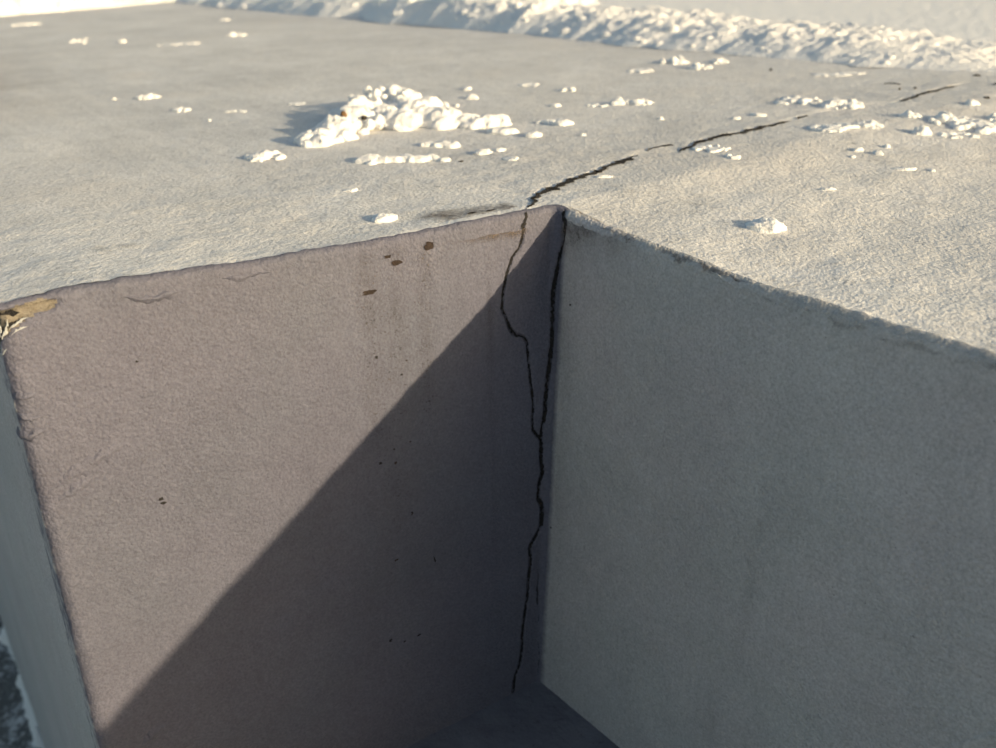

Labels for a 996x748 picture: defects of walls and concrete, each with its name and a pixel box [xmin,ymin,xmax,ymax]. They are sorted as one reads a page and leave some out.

crack [884,83,958,102]
spalling [0,298,57,357]
crack [500,115,808,693]